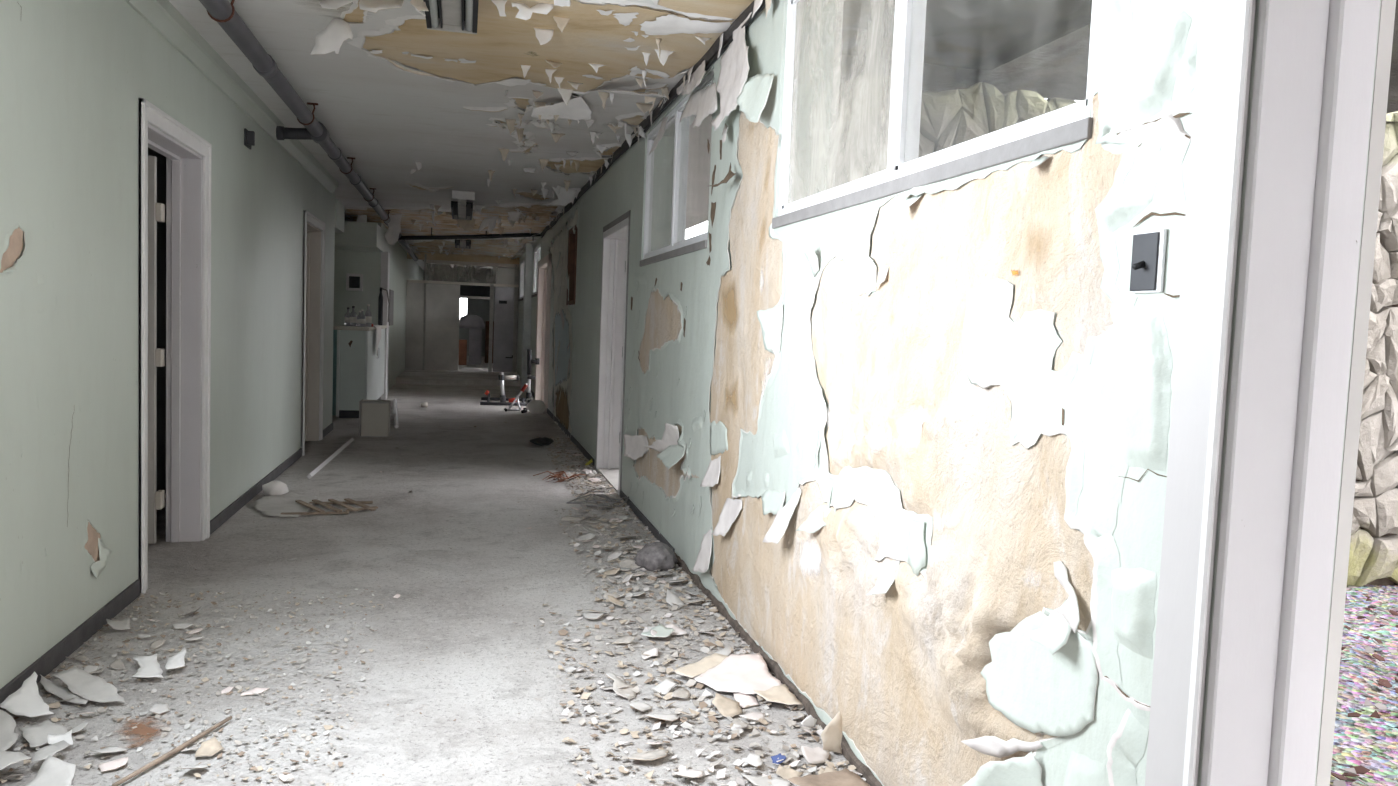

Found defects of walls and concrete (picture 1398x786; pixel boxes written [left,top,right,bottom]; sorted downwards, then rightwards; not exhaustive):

peeling [0,223,26,277]
peeling [310,0,754,437]
peeling [623,84,1134,786]
peeling [81,518,113,579]
peeling [1106,709,1149,786]